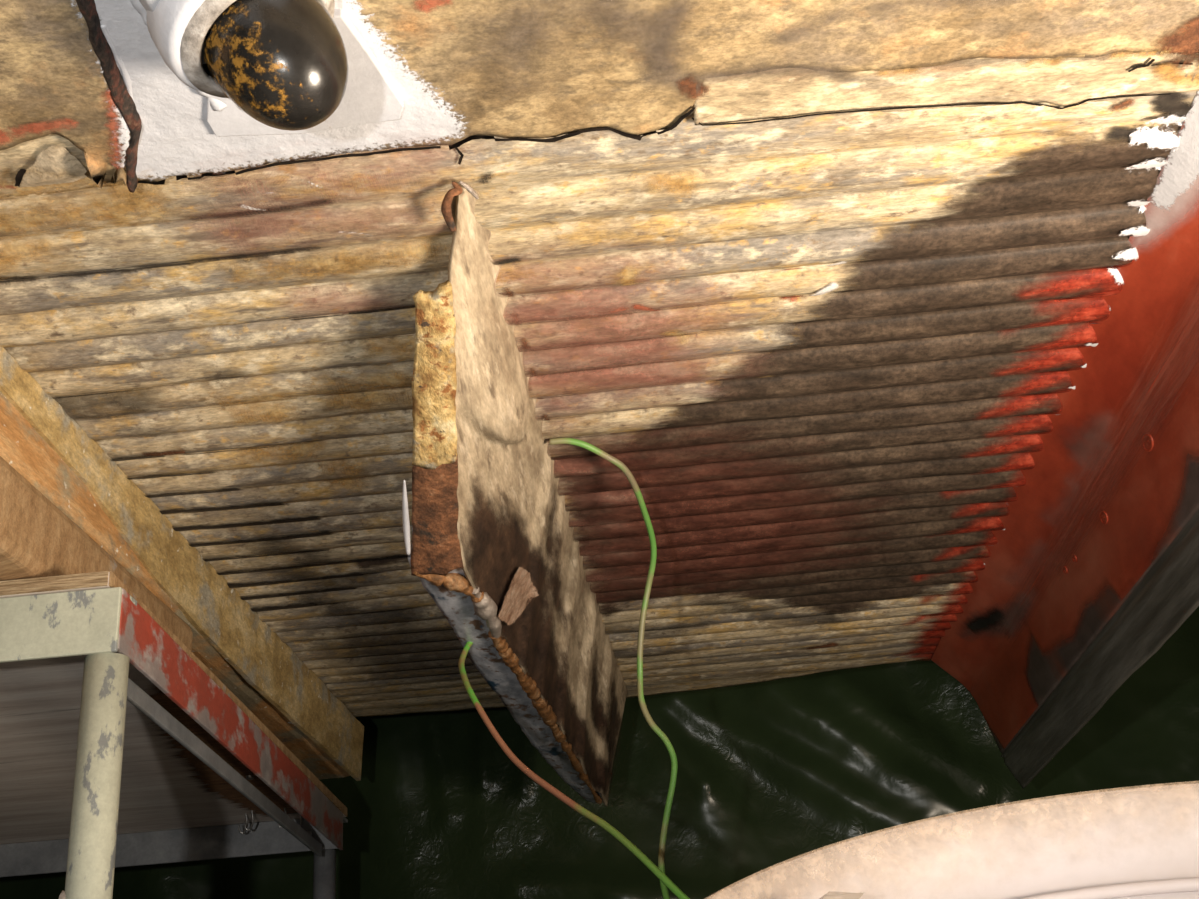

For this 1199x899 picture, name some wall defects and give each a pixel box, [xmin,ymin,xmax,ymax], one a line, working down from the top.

crack [138,59,1193,185]
water stain [515,279,691,404]
water stain [553,92,1199,656]
spalling [402,480,411,555]
rust [460,487,620,804]